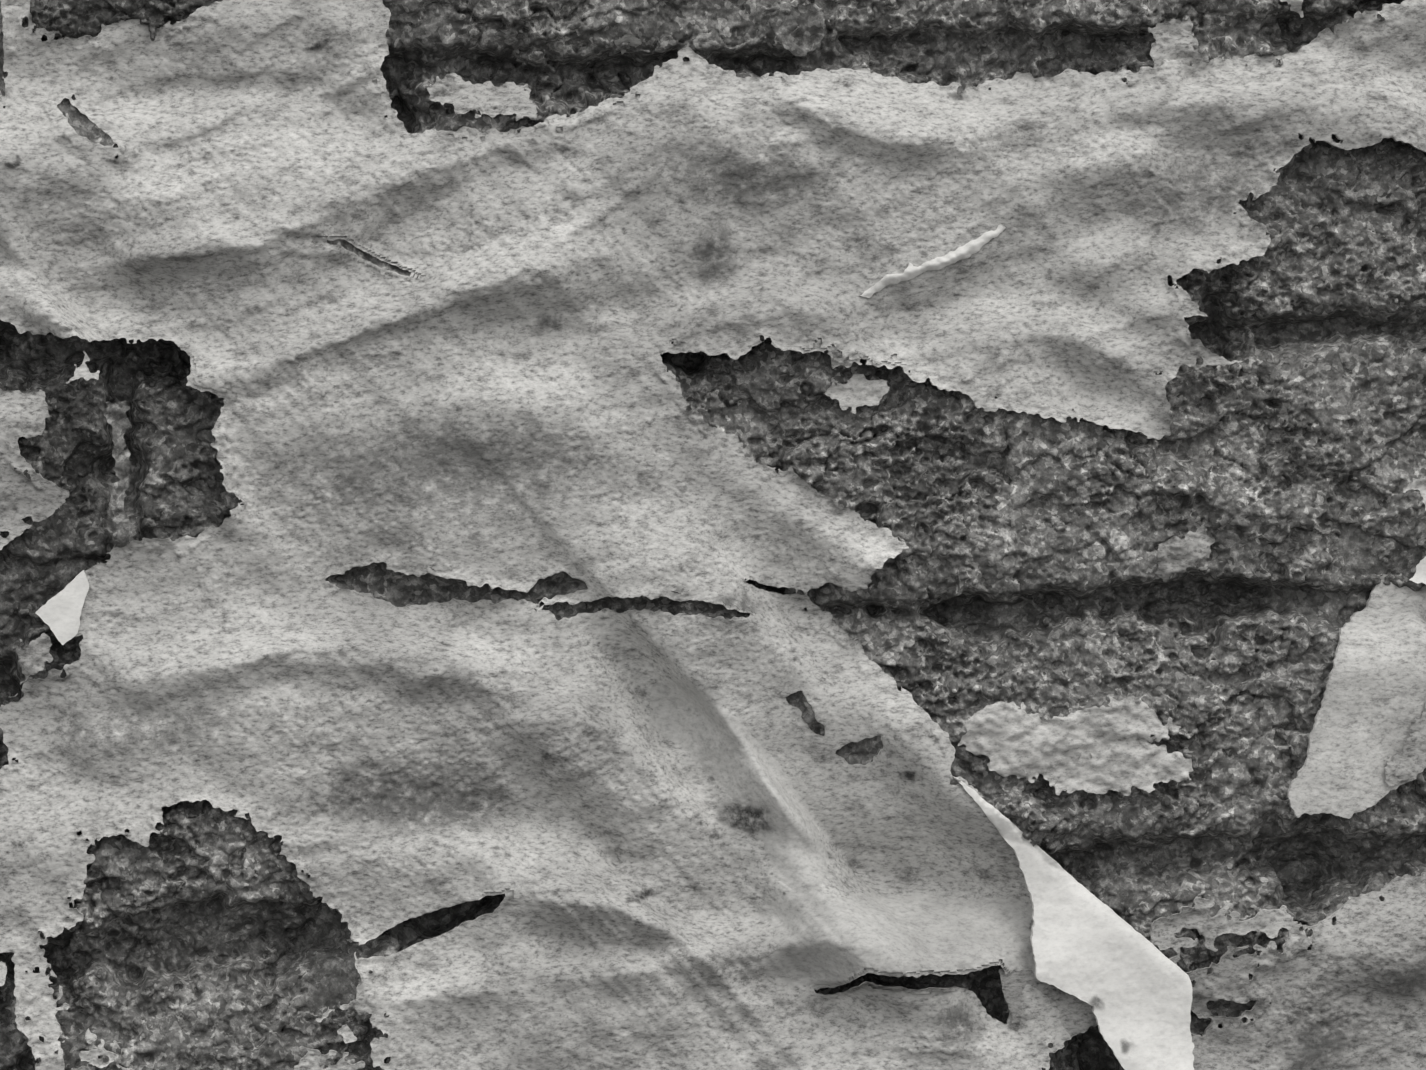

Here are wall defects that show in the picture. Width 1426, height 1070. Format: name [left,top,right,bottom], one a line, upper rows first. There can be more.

spalling [380,0,1404,134]
peeling [0,0,624,232]
spalling [0,320,242,707]
crack [325,562,809,621]
spalling [660,138,1426,1070]
spalling [0,728,9,769]
spalling [39,800,399,1070]
crack [398,894,505,951]
spalling [0,961,17,1029]
crack [815,965,1009,1024]
spalling [0,1022,29,1070]
spalling [13,1029,41,1070]